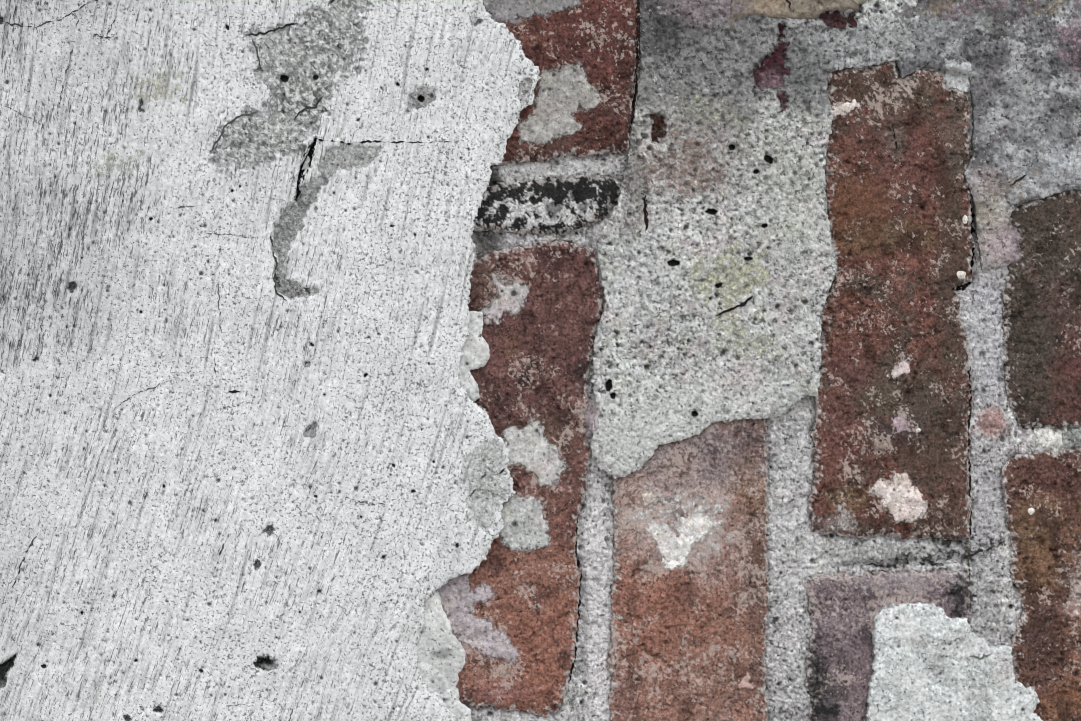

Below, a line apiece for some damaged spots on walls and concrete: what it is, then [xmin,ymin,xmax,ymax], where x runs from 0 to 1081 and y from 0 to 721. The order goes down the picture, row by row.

spalling [819,10,857,32]
spalling [406,87,436,112]
peeling [518,78,533,106]
spalling [649,114,667,142]
spalling [752,23,790,112]
crack [295,138,449,201]
peeling [458,311,490,402]
peeling [461,443,511,536]
peeling [417,590,472,721]